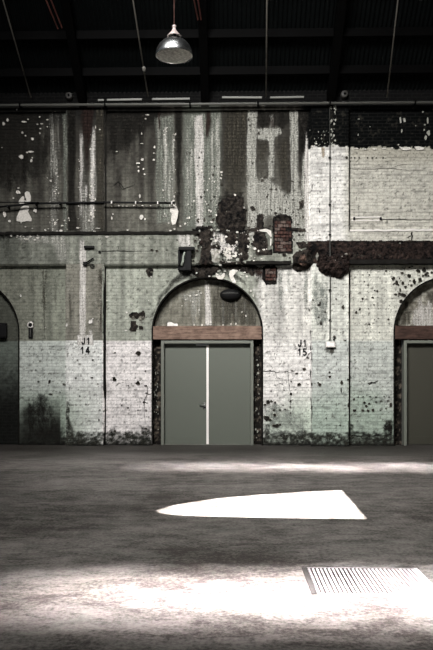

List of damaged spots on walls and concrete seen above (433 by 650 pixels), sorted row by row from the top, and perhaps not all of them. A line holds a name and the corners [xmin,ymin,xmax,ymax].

peeling [354,111,430,150]
water stain [0,106,309,261]
spalling [162,151,433,303]
spalling [125,310,145,331]
water stain [23,396,151,446]
water stain [263,405,394,446]